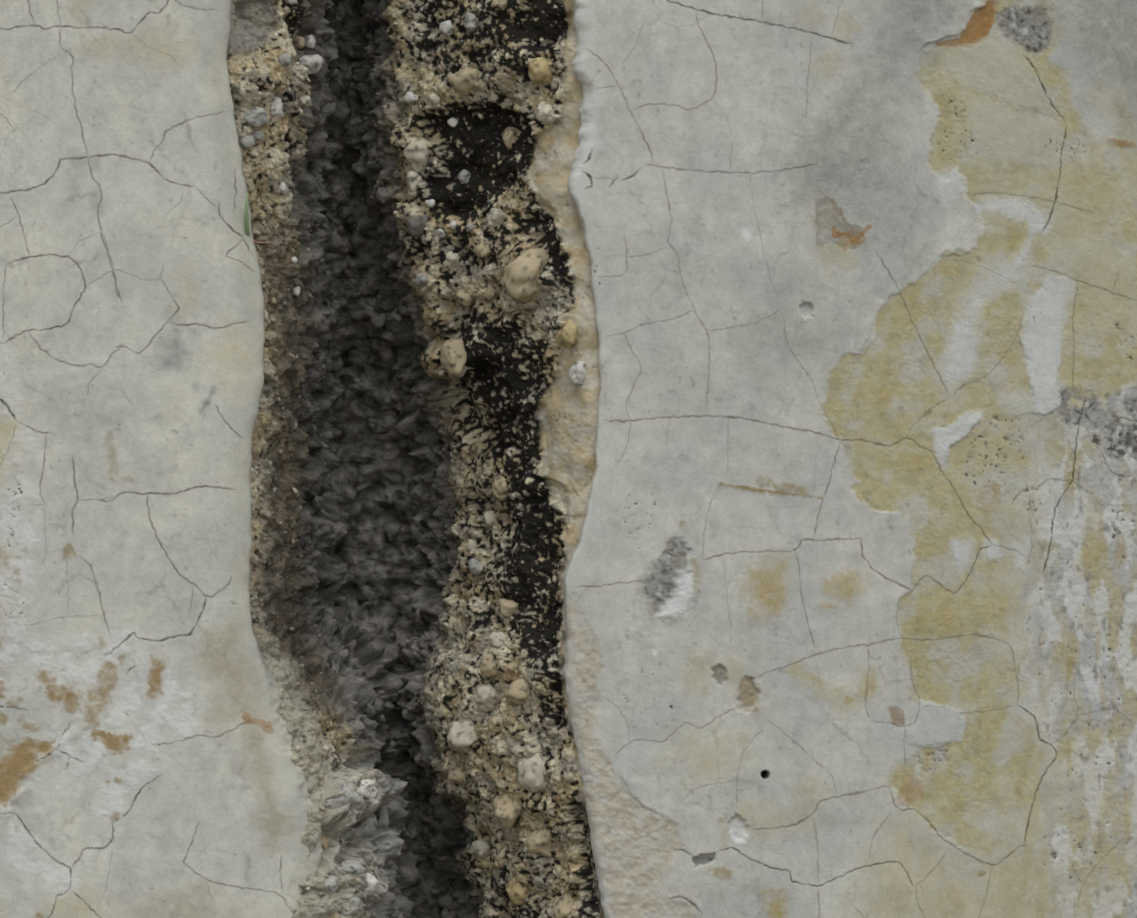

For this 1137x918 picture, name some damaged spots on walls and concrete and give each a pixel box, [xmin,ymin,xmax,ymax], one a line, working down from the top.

corrosion [0,732,62,816]
crack [0,0,605,918]
spalling [562,0,718,918]
crack [571,0,1137,918]
peeling [813,23,1137,879]